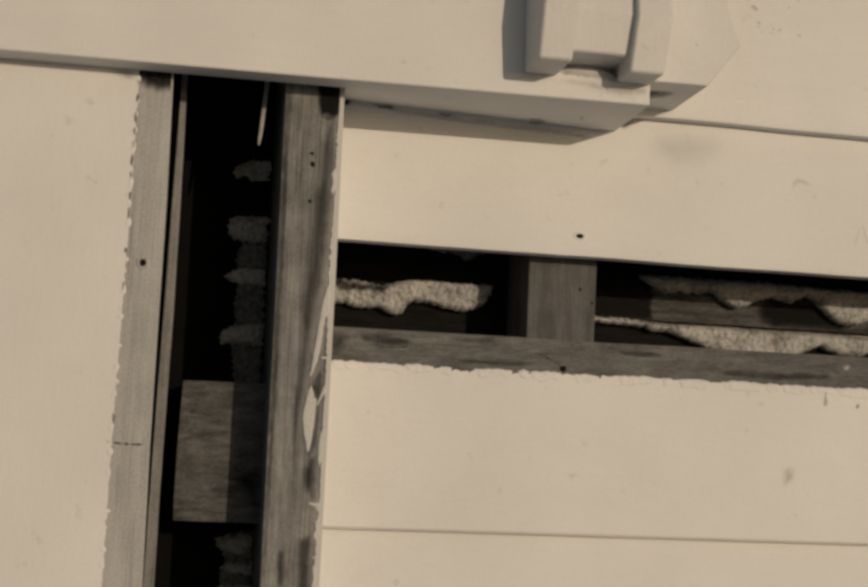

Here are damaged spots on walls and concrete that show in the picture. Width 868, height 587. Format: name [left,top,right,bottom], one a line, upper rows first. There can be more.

peeling [302,284,452,467]
peeling [474,368,561,382]
peeling [574,374,595,383]
peeling [617,376,709,390]
peeling [721,381,868,399]